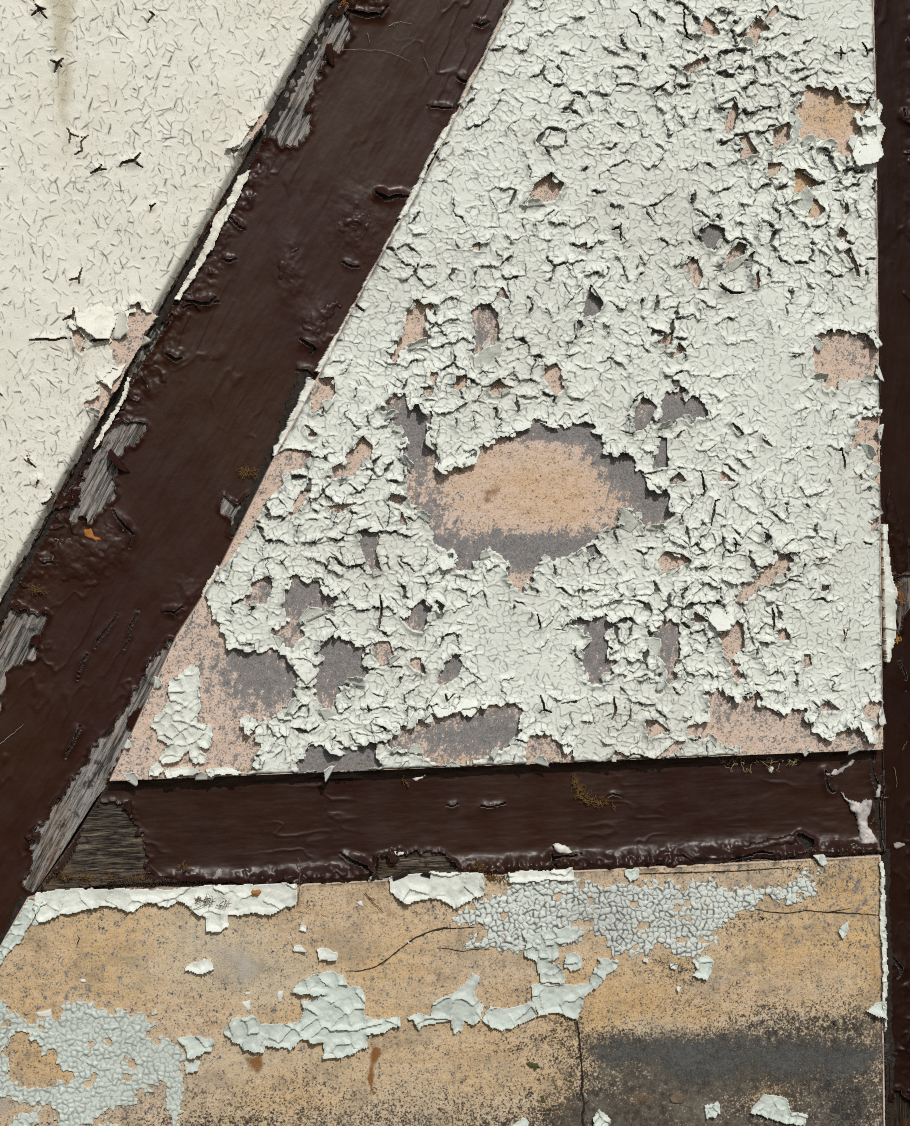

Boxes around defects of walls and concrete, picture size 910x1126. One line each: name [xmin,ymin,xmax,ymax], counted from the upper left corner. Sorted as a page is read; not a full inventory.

crack [375,191,409,201]
peeling [67,170,250,524]
crack [0,0,388,632]
peeling [380,363,712,593]
crack [76,606,183,680]
peeling [0,263,469,965]
peeling [645,549,886,760]
rust [368,1047,380,1088]
peeling [0,833,828,1126]
crack [350,927,491,972]
crack [574,1021,589,1126]
water stain [580,1031,890,1126]